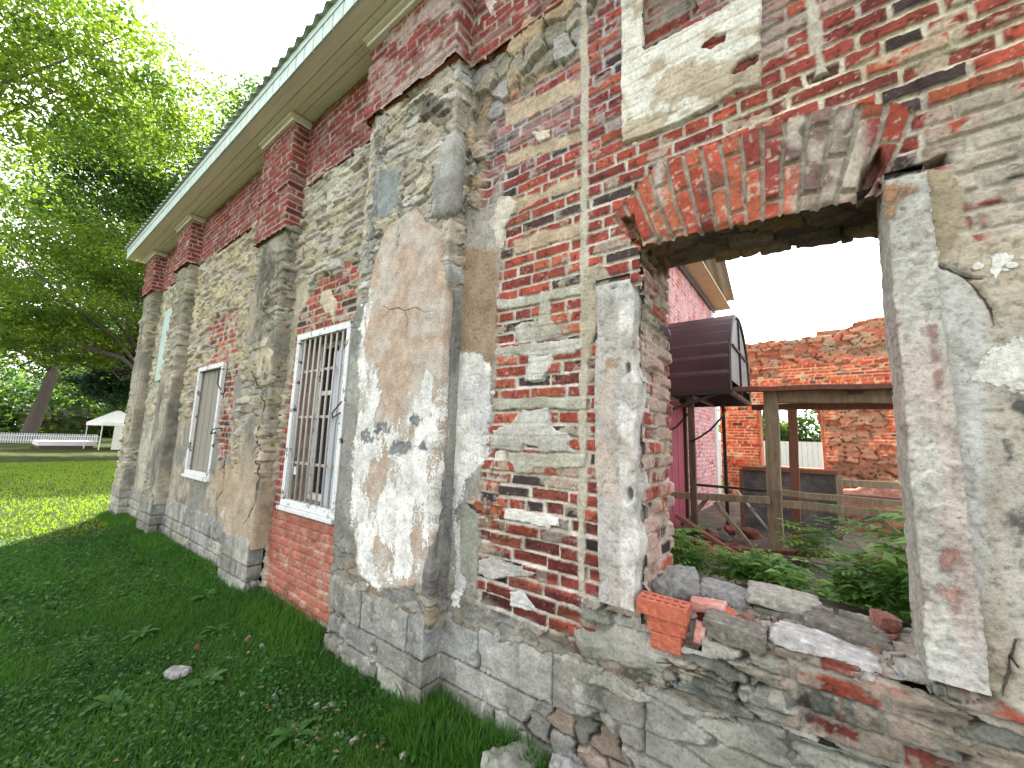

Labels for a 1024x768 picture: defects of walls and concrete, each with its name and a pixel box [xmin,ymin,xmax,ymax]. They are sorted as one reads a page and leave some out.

crack [938,265,994,325]
peeling [972,252,1024,286]
peeling [970,334,1024,394]
flaking render [349,209,588,612]
crack [217,371,266,524]